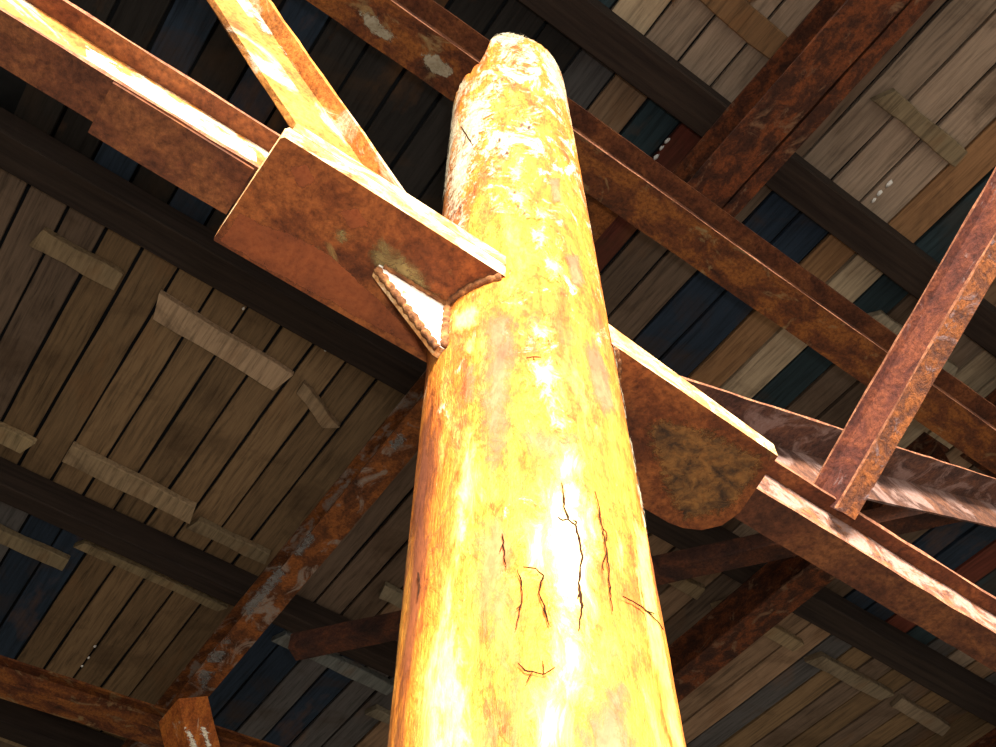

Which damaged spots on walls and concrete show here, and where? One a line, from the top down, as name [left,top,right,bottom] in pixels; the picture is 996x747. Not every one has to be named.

peeling [496,33,538,64]
peeling [442,76,566,281]
rust [566,255,583,285]
rust [466,317,518,470]
peeling [526,317,572,437]
rust [586,340,613,412]
rust [400,413,437,697]
crack [500,534,549,630]
crack [558,482,663,630]
crack [518,660,555,681]
rust [577,685,632,747]